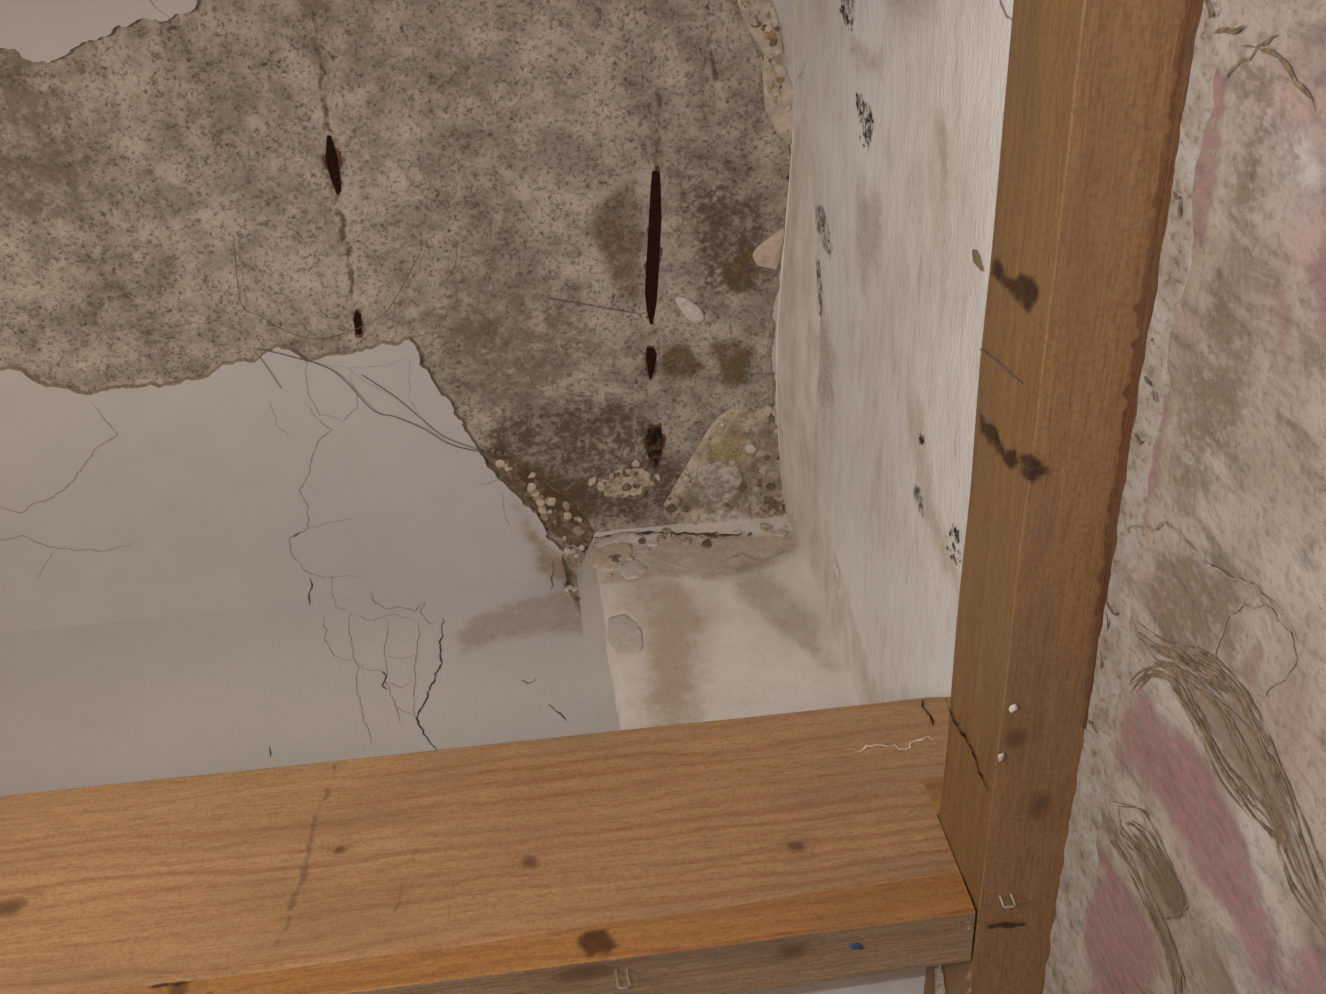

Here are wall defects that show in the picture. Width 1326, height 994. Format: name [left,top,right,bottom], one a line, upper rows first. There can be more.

corrosion [323,135,342,195]
spalling [0,0,793,616]
corrosion [598,166,662,325]
corrosion [644,345,702,380]
water stain [693,185,762,288]
crack [0,401,133,580]
crack [270,355,445,750]
corrosion [643,423,666,469]